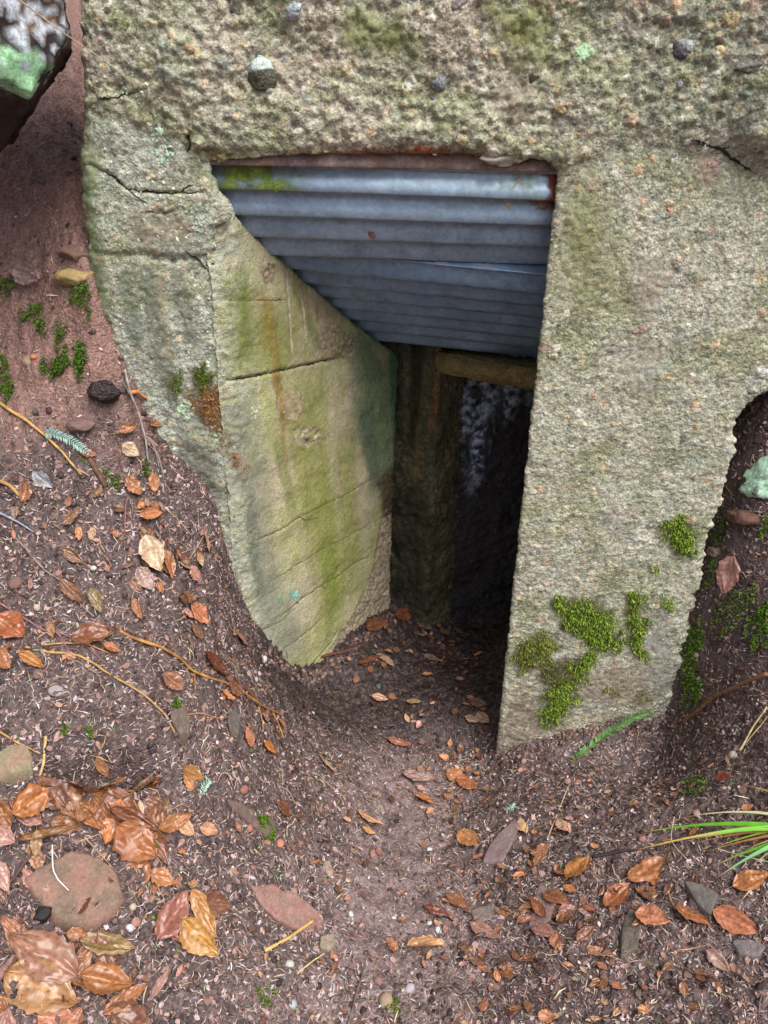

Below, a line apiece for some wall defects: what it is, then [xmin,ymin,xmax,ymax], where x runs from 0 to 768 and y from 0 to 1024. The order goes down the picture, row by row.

rust [340,145,481,157]
crack [690,139,752,171]
crack [96,167,204,214]
rust [529,174,557,210]
crack [228,320,365,381]
leakage [354,337,434,611]